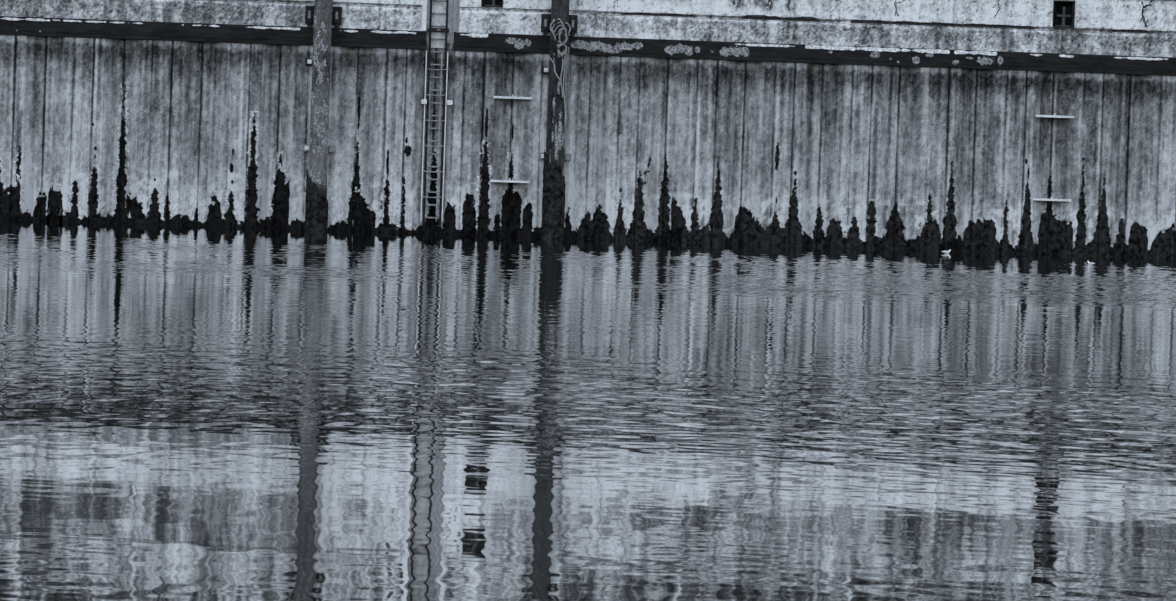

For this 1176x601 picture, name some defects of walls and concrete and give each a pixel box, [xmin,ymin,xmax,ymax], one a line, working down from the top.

water stain [731,0,790,10]
water stain [173,188,207,220]
water stain [331,150,345,225]
water stain [574,197,595,230]